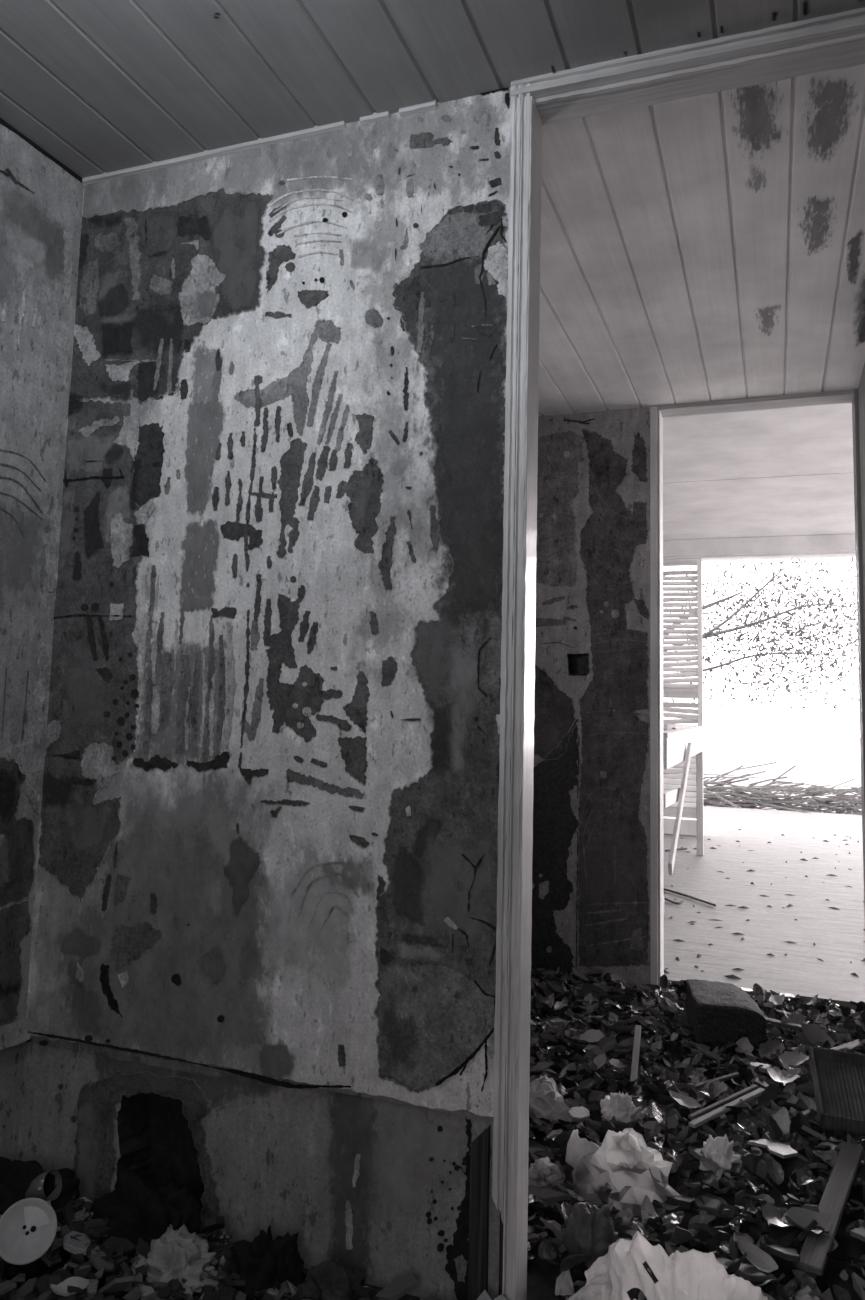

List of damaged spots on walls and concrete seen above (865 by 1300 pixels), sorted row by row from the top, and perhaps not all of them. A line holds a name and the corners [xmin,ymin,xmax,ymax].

leakage [857,279,865,346]
spalling [0,115,508,1093]
peeling [531,429,650,973]
crack [28,1031,351,1089]